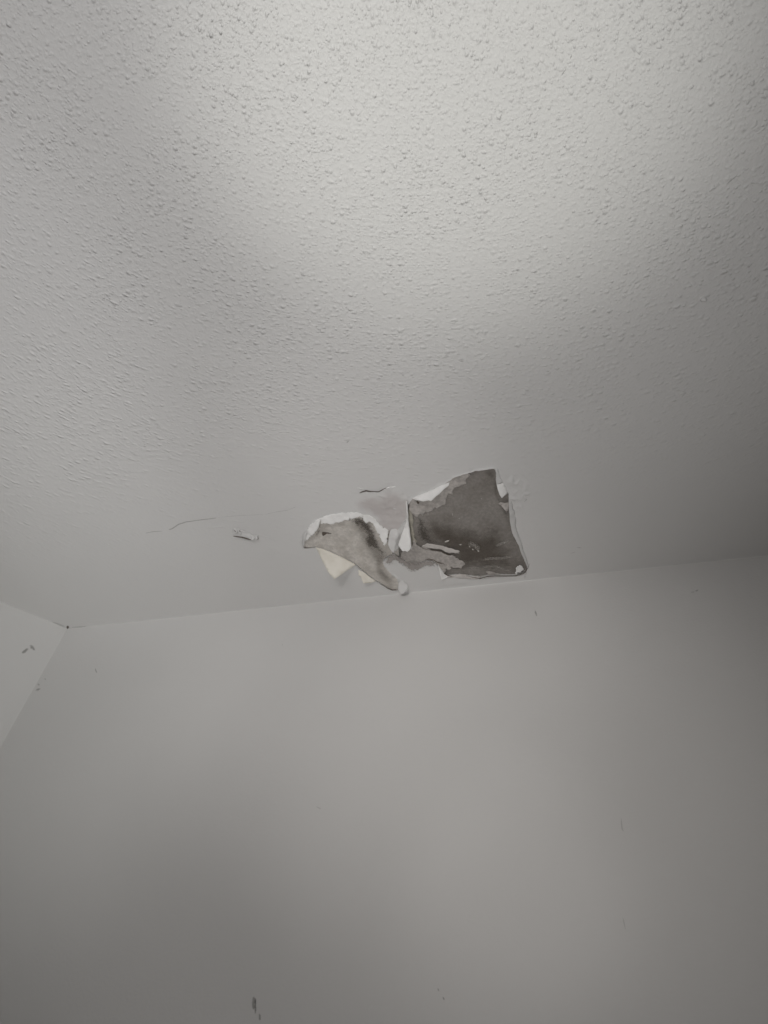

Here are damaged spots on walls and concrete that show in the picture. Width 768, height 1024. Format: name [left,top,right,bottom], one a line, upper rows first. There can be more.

peeling [302,467,529,594]